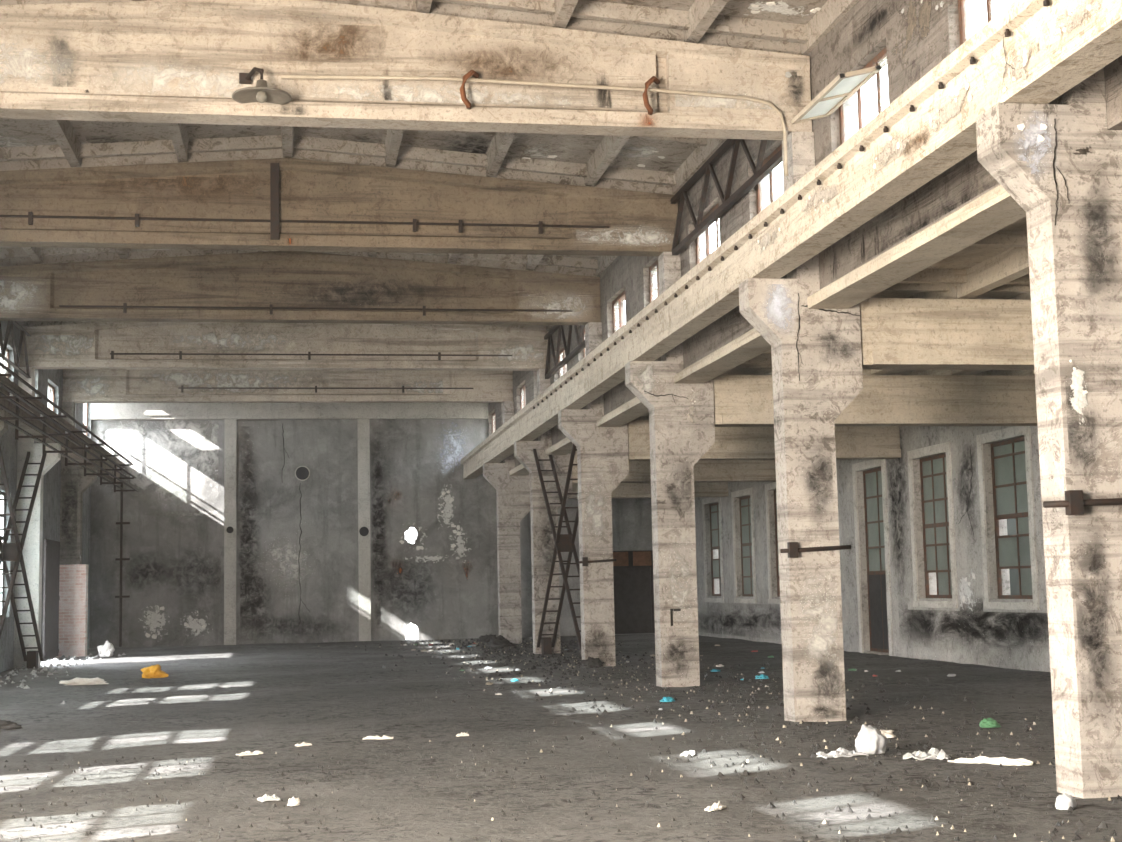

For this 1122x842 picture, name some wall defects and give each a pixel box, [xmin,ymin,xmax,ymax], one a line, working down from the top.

damp [296,25,361,59]
peeling [1017,122,1049,169]
damp [1086,204,1114,291]
peeling [769,285,791,326]
peeling [1069,359,1088,427]
damp [240,435,333,634]
damp [906,602,1048,642]